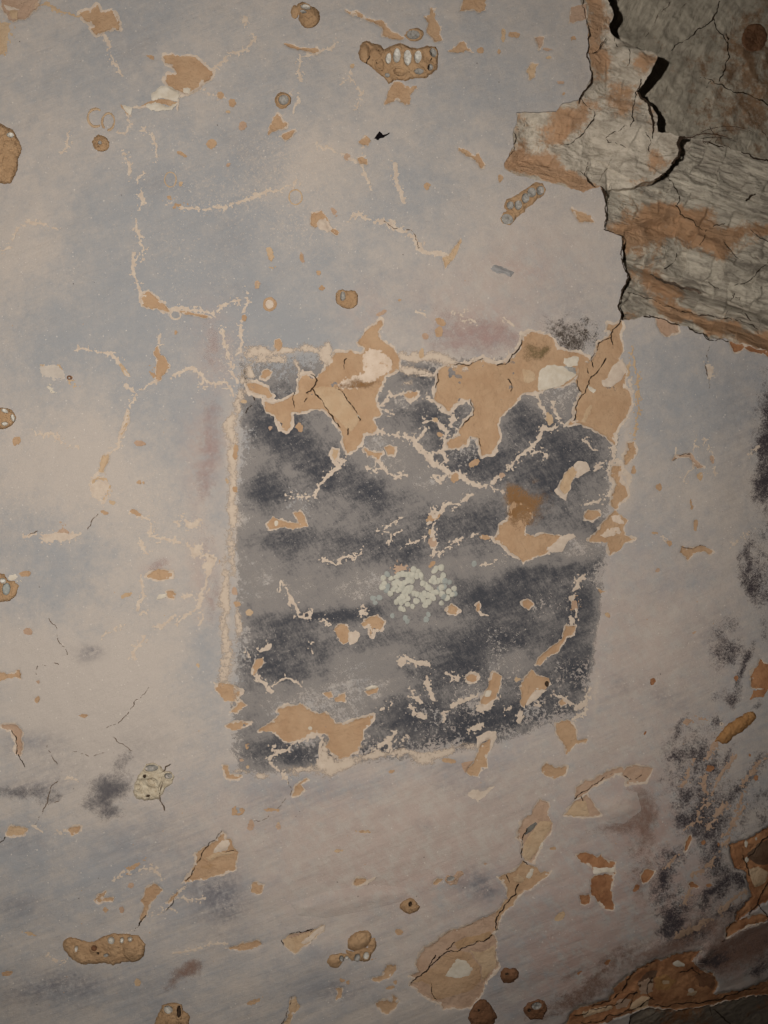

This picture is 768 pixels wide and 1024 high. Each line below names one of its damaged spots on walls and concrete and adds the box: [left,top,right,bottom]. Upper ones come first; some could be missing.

crack [554,0,768,420]
flaking render [74,15,643,802]
leakage [529,317,599,358]
flaking render [729,341,768,357]
flaking render [93,831,239,921]
flaking render [371,764,653,1015]
flaking render [564,728,768,1024]